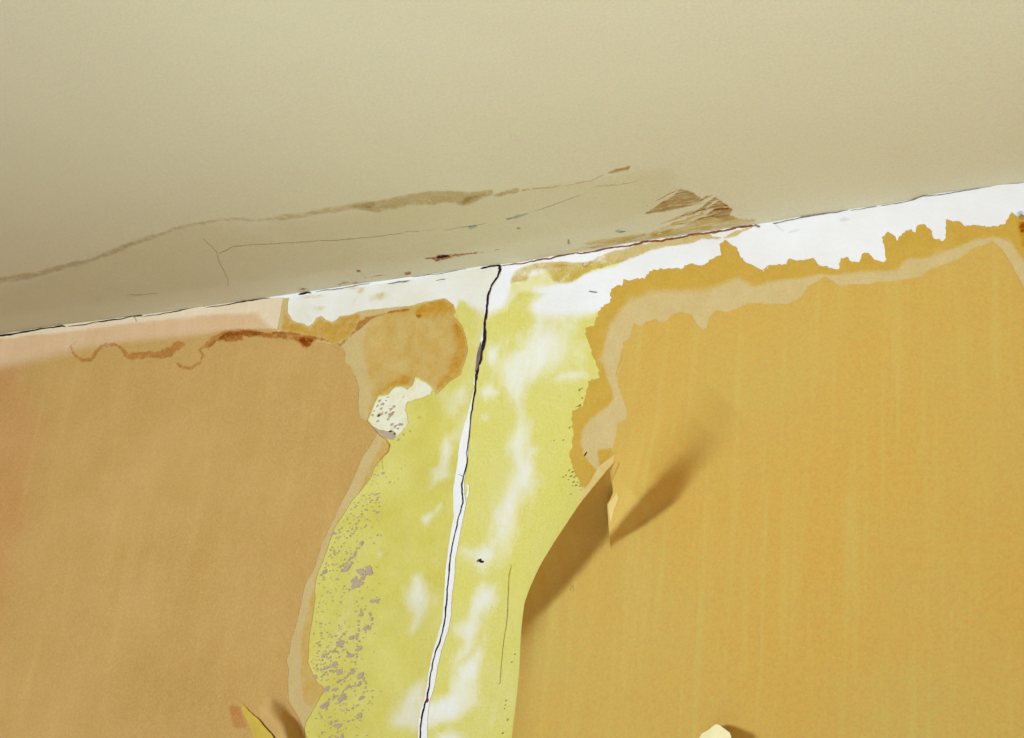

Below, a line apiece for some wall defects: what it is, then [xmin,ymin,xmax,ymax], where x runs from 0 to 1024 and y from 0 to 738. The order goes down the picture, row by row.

crack [0,298,267,336]
flaking render [287,183,1024,738]
crack [298,182,1024,738]